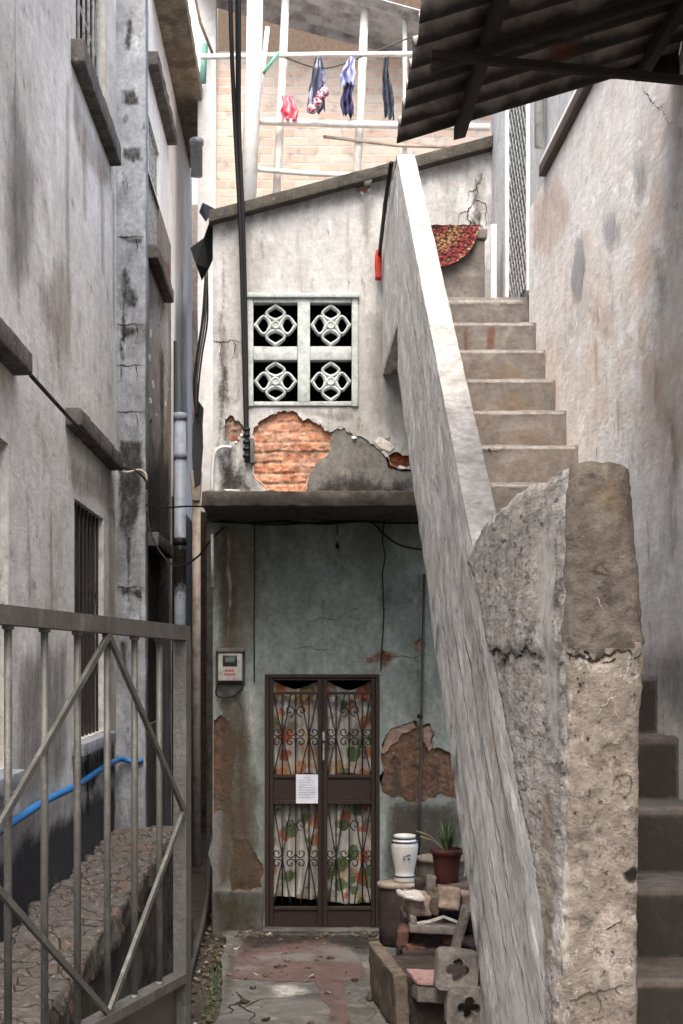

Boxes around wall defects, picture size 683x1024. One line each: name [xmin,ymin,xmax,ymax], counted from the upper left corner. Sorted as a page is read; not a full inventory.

crack [458,176,487,229]
damp [119,353,170,564]
spalling [225,409,414,491]
damp [122,548,170,623]
spalling [208,715,264,891]
spalling [380,721,467,805]
crack [395,578,641,1021]